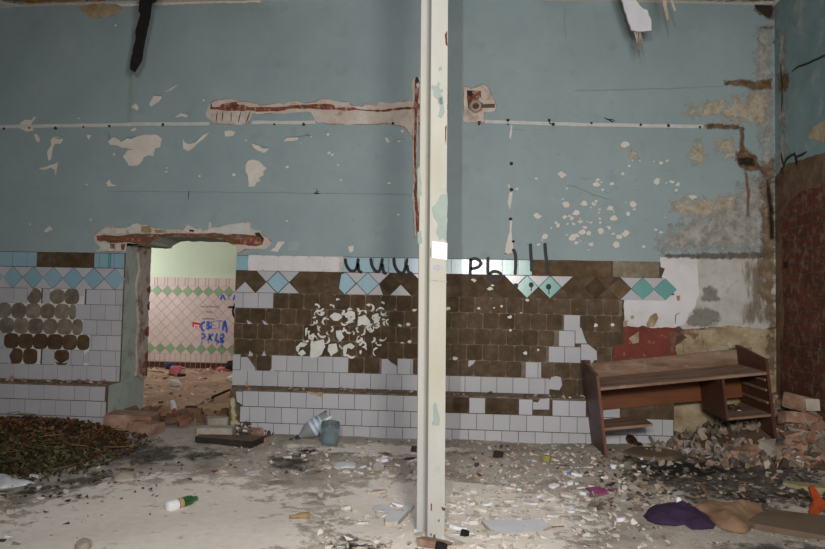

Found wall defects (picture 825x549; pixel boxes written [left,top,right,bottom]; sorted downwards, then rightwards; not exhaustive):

spalling [754,5,775,29]
spalling [463,84,497,123]
crack [780,54,825,111]
peeling [39,136,63,175]
peeling [108,128,162,166]
peeling [245,140,269,187]
spalling [432,192,448,242]
peeling [37,252,95,268]
peeling [0,288,90,366]
peeling [95,226,418,375]
peeling [446,185,825,422]
peeling [432,397,469,426]